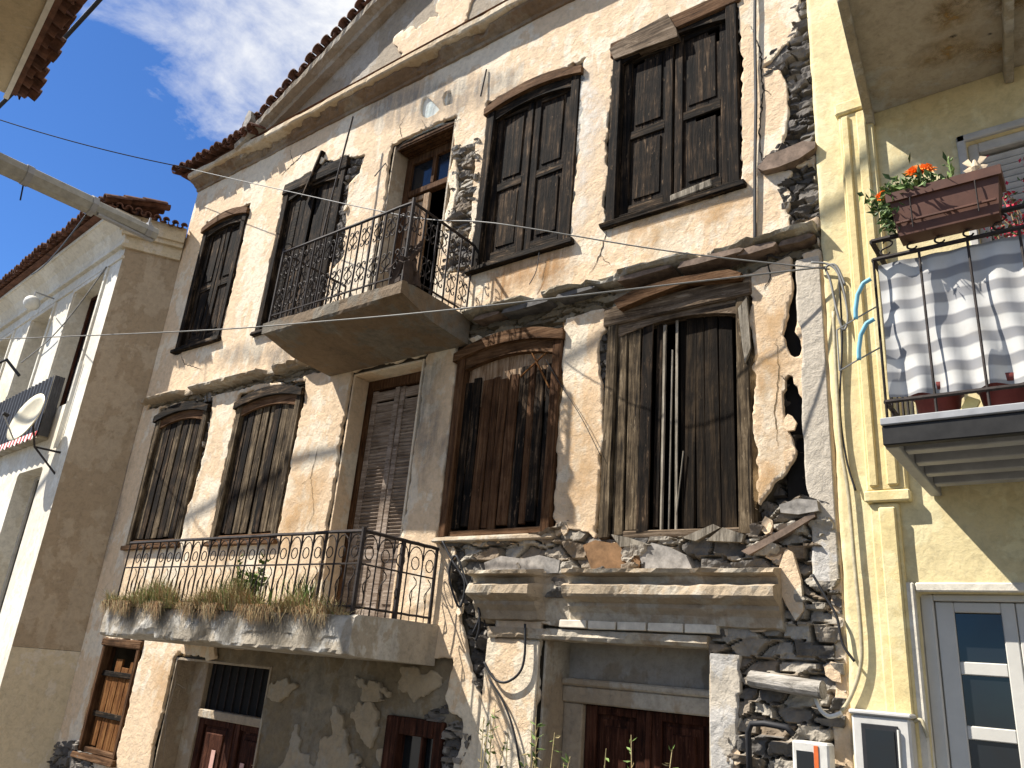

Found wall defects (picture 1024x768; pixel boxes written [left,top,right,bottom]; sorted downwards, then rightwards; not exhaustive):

spalling [706,0,822,274]
spalling [329,157,364,274]
spalling [465,285,647,346]
crack [761,340,805,532]
peeling [762,516,782,561]
peeling [214,648,462,768]
spalling [449,546,497,695]
peeling [824,661,842,683]